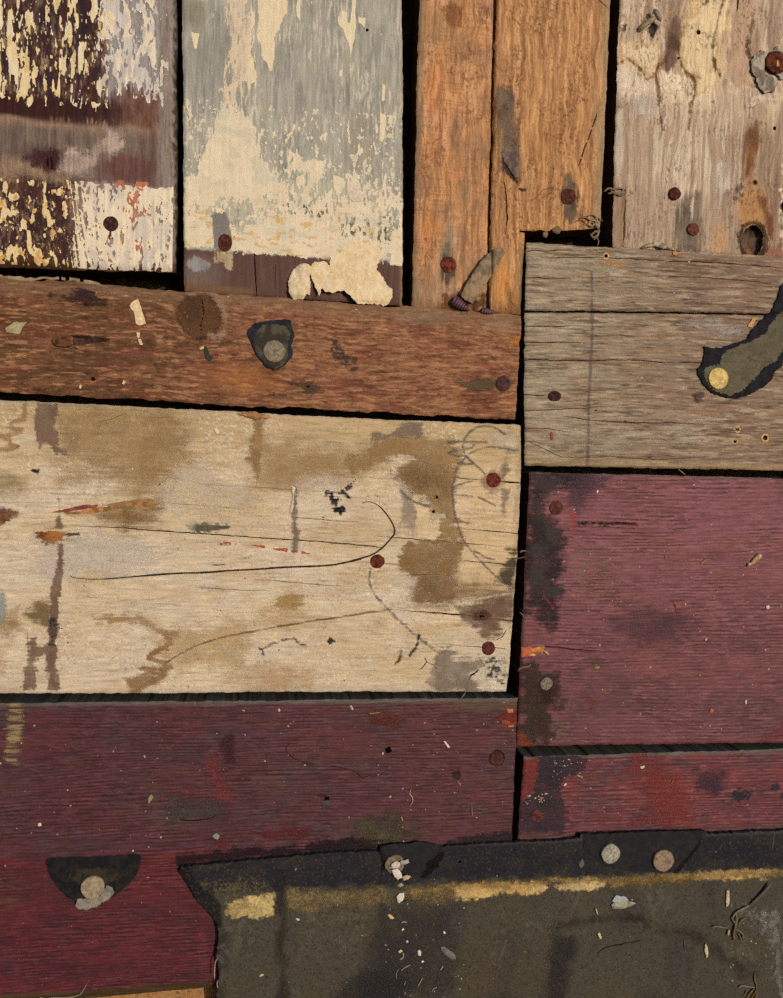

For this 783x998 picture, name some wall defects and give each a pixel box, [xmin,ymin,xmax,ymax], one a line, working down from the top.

peeling [0,0,403,306]
peeling [614,108,625,180]
peeling [712,160,730,206]
leakage [246,419,608,638]